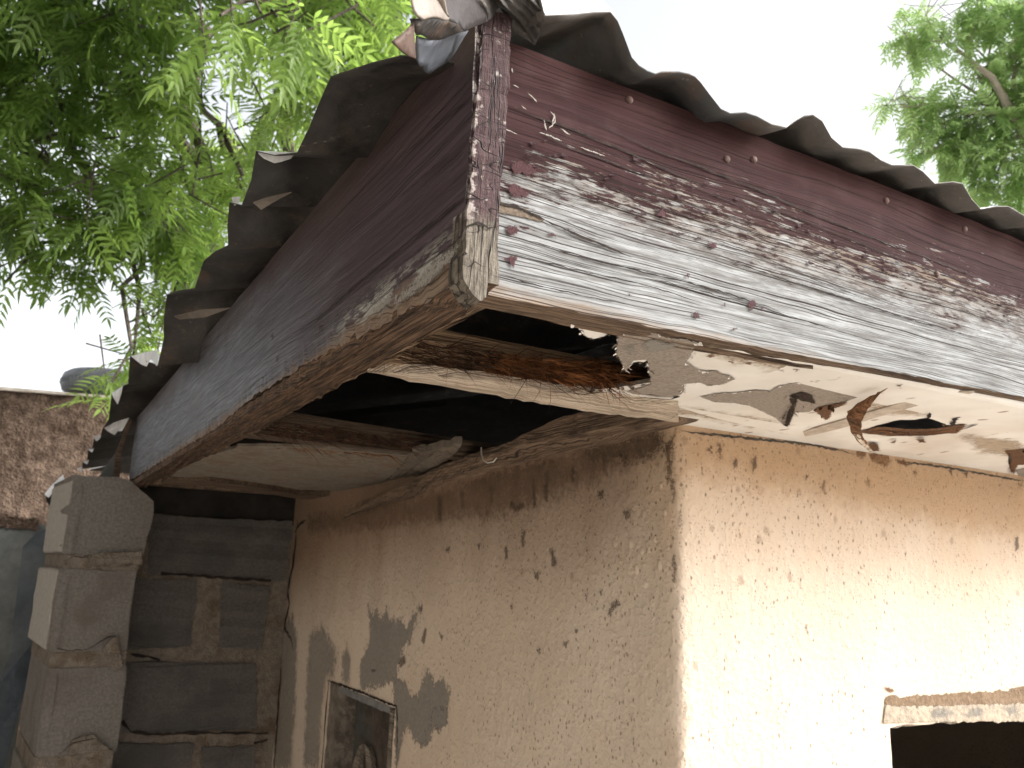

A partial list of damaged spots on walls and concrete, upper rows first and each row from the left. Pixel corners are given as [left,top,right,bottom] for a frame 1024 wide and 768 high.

peeling [508,111,569,198]
peeling [614,176,731,249]
peeling [570,324,857,427]
damp [309,433,672,530]
crack [57,635,160,661]
crack [121,520,306,765]
peeling [273,604,450,768]